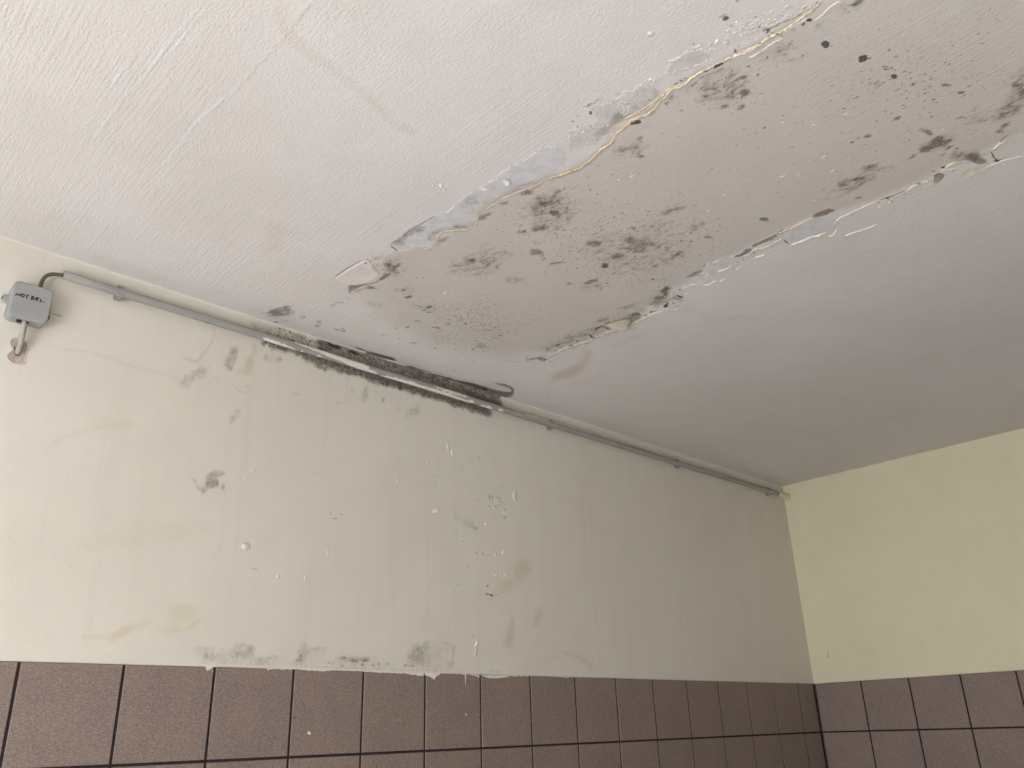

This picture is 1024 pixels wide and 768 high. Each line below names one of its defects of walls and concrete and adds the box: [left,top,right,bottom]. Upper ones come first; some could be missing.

peeling [390,0,840,252]
peeling [925,156,1022,186]
peeling [770,210,877,245]
water stain [265,328,514,415]